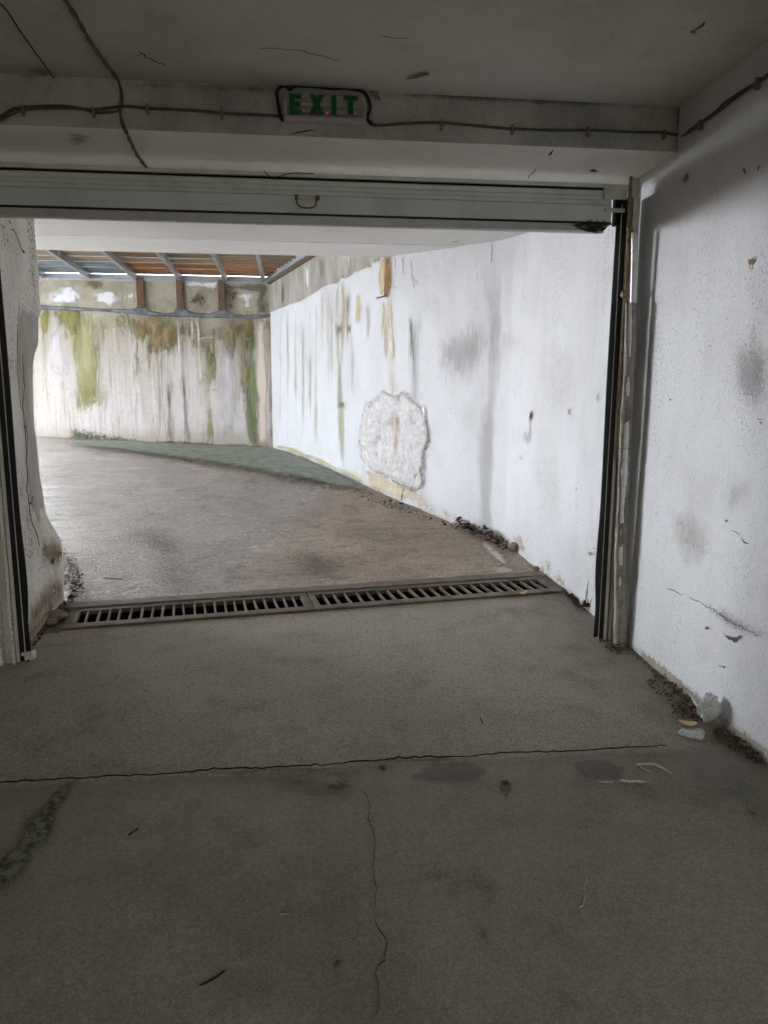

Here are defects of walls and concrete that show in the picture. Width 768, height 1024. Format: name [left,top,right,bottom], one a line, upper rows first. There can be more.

leakage [49,281,133,408]
leakage [124,282,427,507]
peeling [358,391,429,491]
crack [666,587,762,636]
crack [0,745,666,783]
crack [365,793,388,1010]